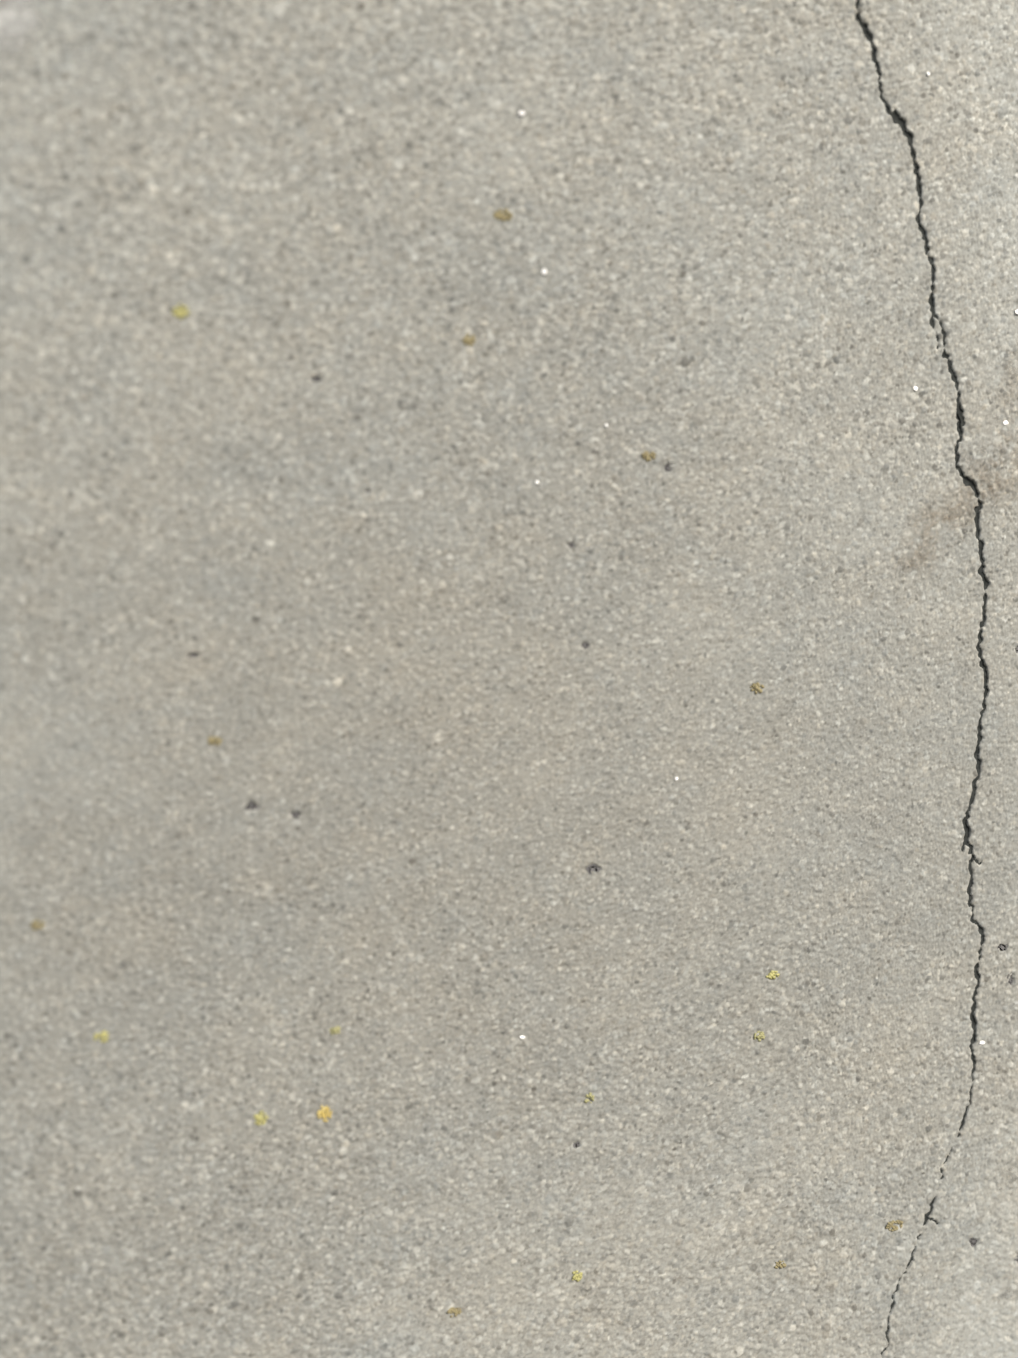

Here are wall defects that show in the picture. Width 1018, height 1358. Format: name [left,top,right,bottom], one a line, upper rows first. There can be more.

crack [855,0,989,1355]